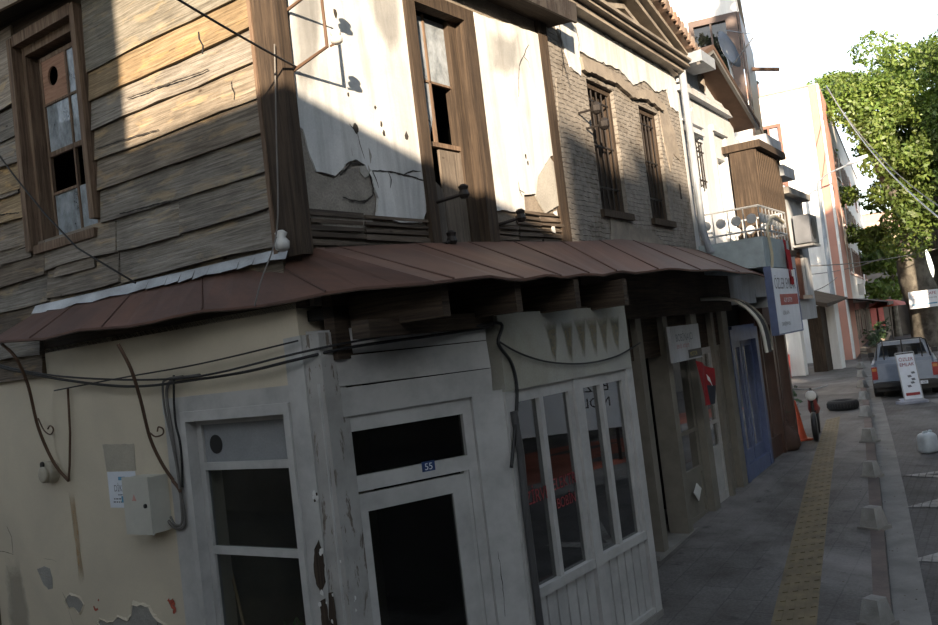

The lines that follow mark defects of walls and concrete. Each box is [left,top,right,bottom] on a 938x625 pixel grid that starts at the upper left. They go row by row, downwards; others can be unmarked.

flaking render [301,131,431,248]
flaking render [499,76,602,242]
flaking render [97,600,167,625]
peeling [313,540,337,625]